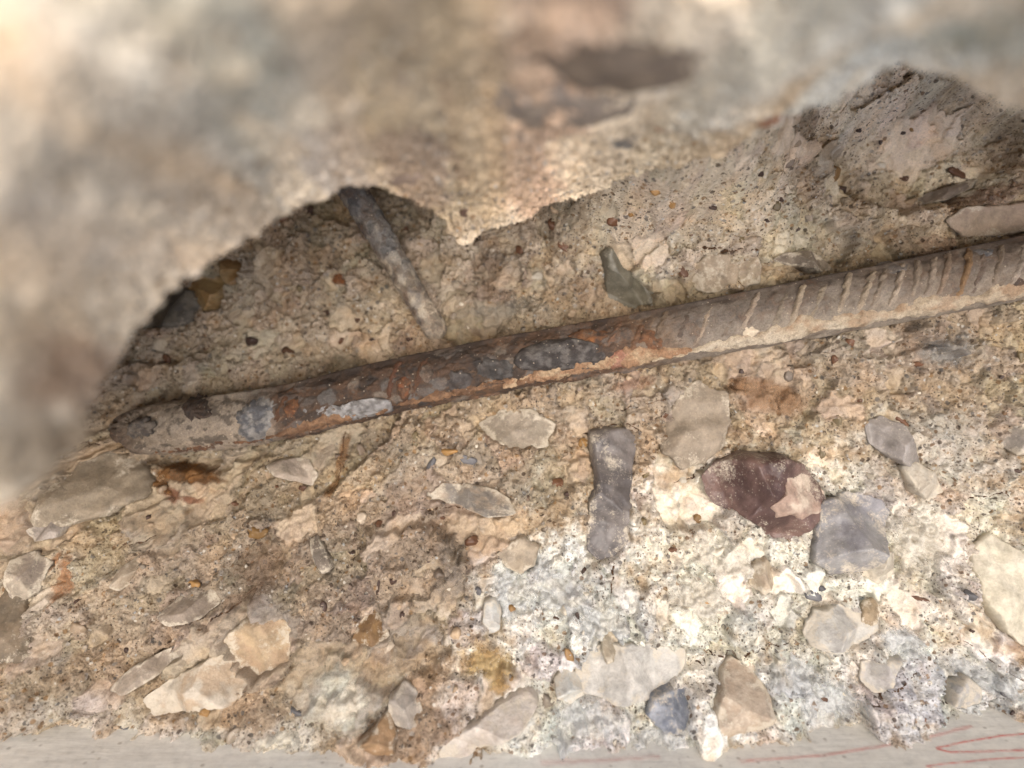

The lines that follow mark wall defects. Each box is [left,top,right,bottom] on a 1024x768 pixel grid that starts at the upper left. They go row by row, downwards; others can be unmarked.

spalling [0,0,1024,505]
corrosion [638,328,663,350]
corrosion [445,328,628,400]
corrosion [181,393,215,422]
corrosion [728,378,801,415]
corrosion [126,415,158,439]
corrosion [152,462,226,504]